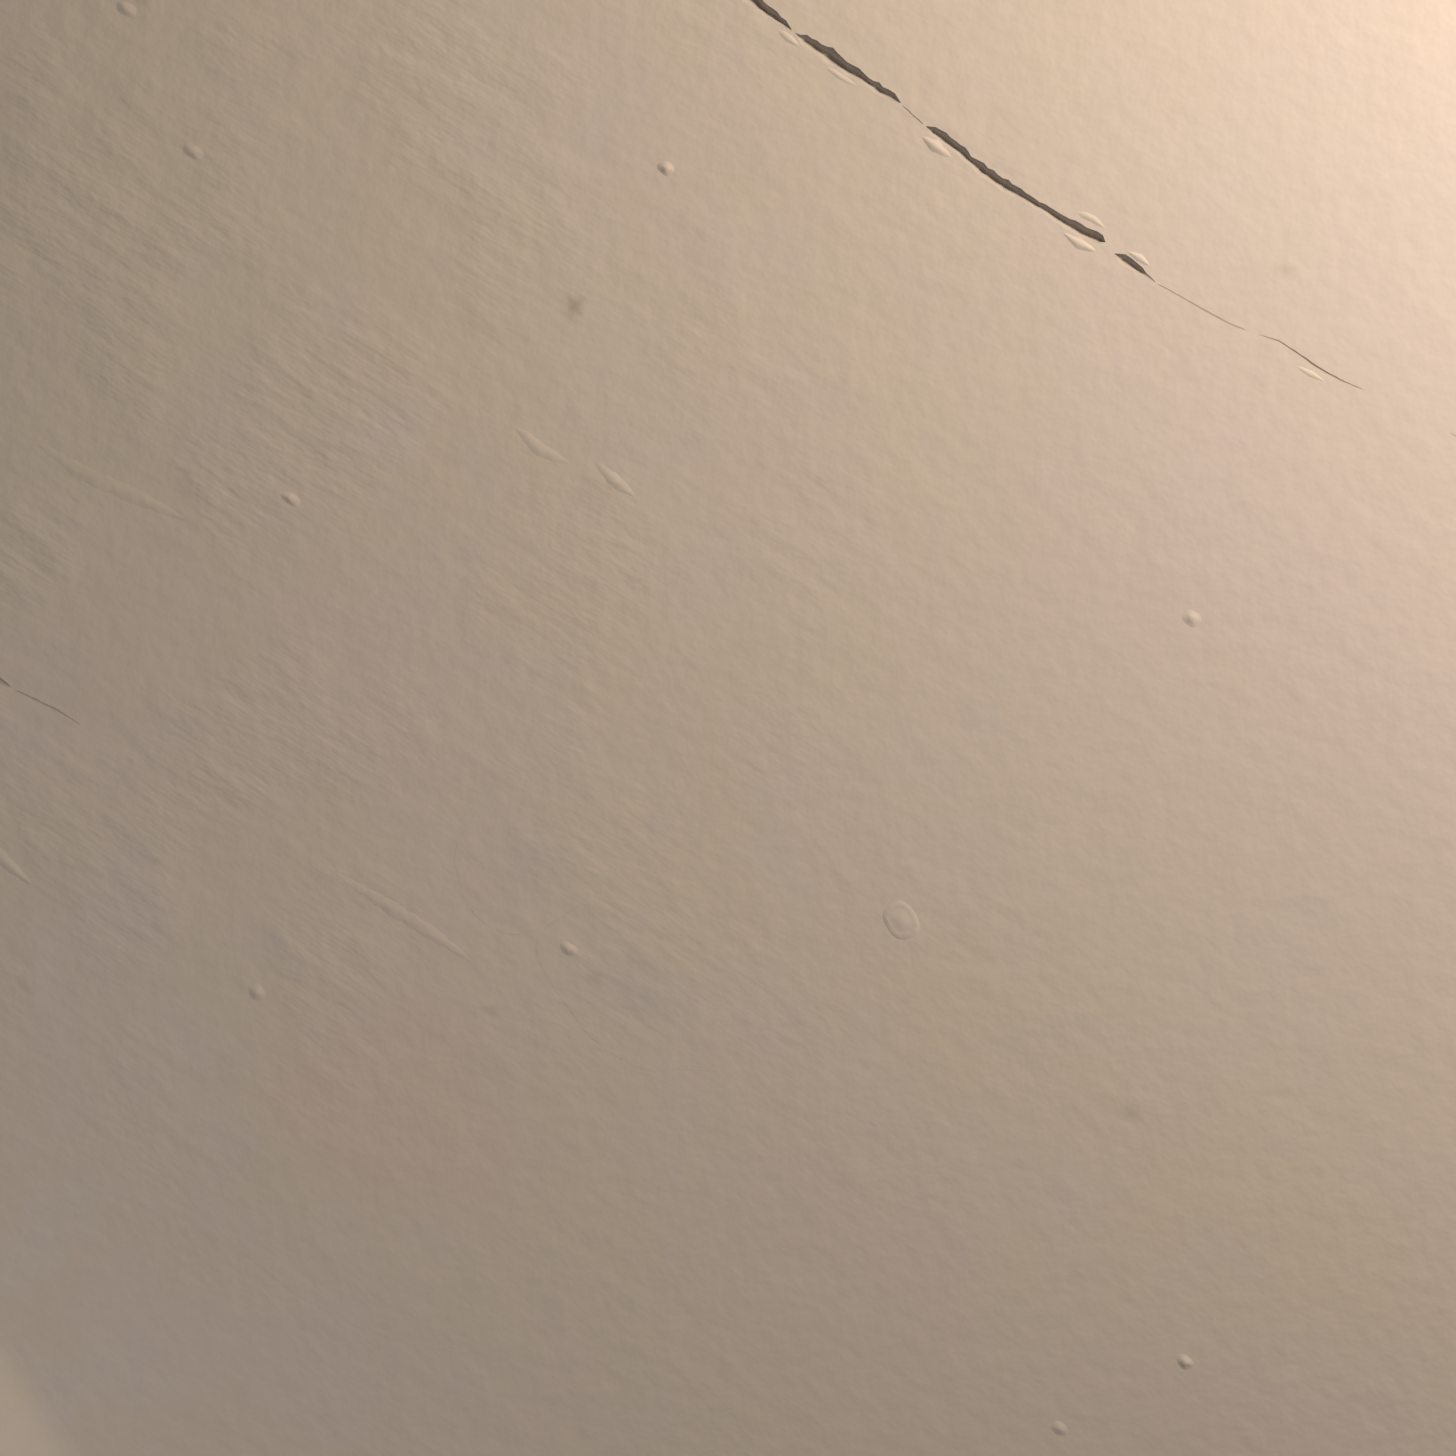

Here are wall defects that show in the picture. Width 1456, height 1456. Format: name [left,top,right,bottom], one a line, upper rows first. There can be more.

crack [742,0,1363,390]